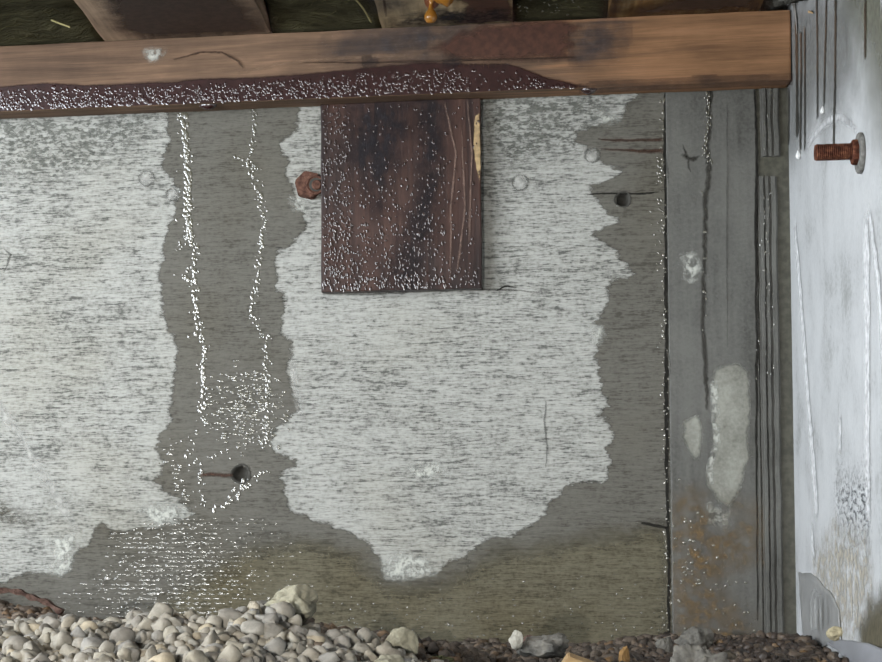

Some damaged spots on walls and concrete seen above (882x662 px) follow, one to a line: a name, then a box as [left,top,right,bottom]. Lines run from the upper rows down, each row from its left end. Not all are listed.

leakage [0,0,672,644]
corrosion [672,508,756,636]
leakage [755,8,852,634]
leakage [839,213,882,525]